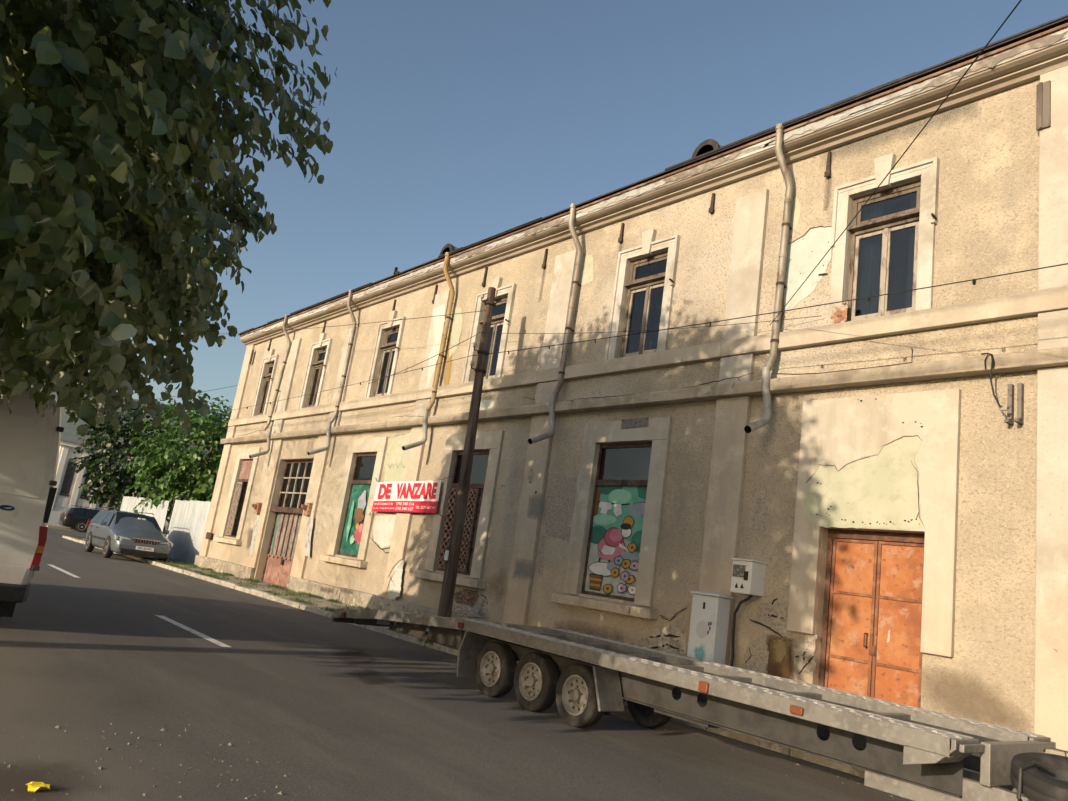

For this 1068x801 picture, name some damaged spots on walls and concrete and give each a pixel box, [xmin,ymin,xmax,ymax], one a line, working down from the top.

peeling [784,196,832,310]
spalling [803,421,924,529]
peeling [373,515,396,549]
spalling [635,607,687,656]
spalling [743,598,790,673]
spalling [793,635,817,675]